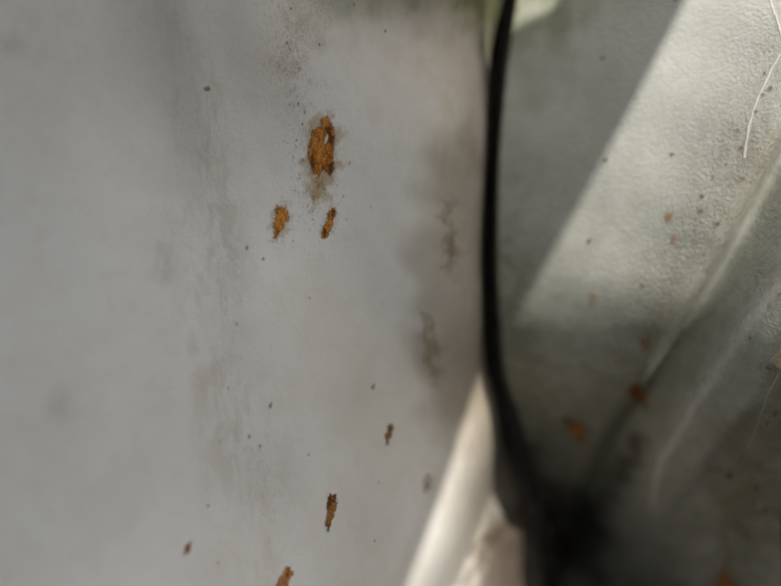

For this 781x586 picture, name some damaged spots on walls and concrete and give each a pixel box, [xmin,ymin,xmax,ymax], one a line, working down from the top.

corrosion [308,116,335,177]
corrosion [273,205,289,238]
corrosion [321,208,336,239]
peeling [648,274,781,512]
corrosion [325,494,337,533]
corrosion [276,568,293,586]